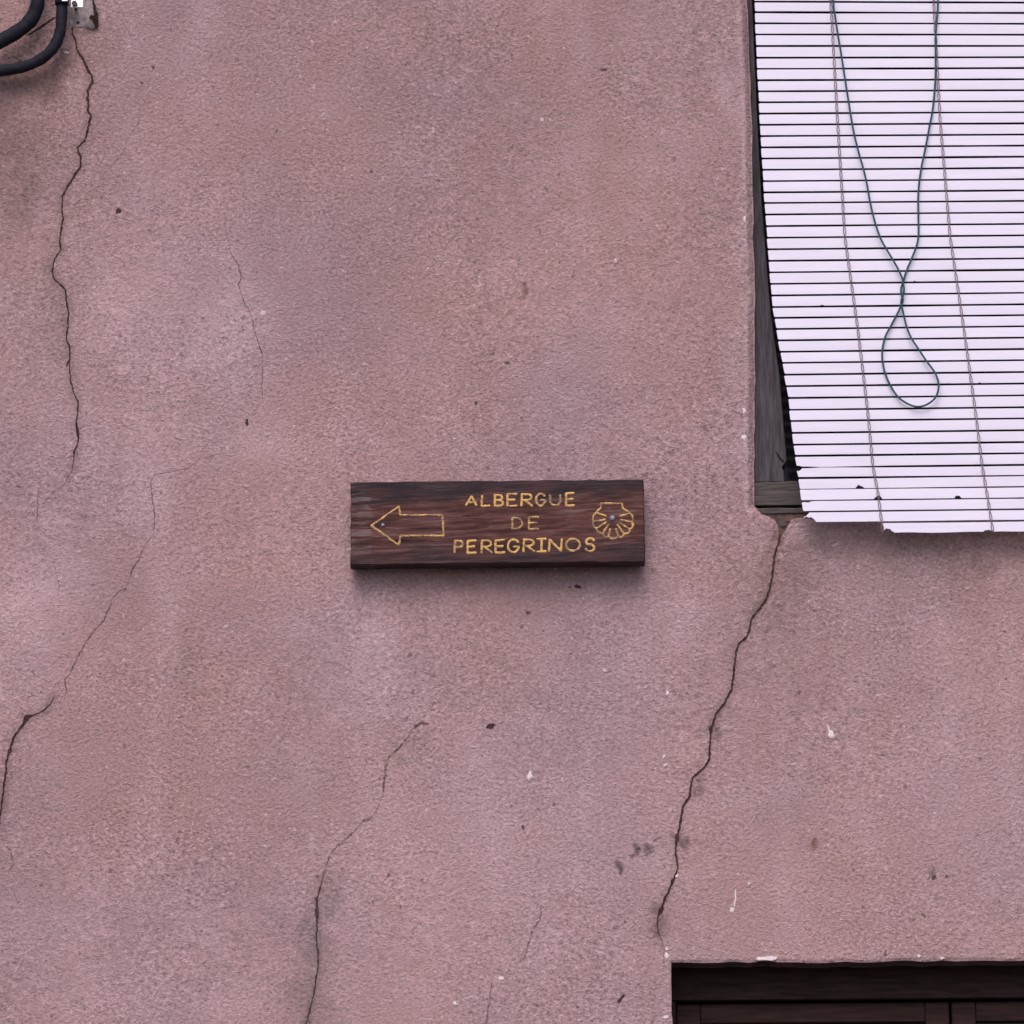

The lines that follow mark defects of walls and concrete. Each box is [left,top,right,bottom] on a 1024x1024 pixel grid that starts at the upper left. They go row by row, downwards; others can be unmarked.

crack [13,16,94,478]
crack [0,455,213,819]
crack [305,778,385,1024]
crack [657,534,781,945]